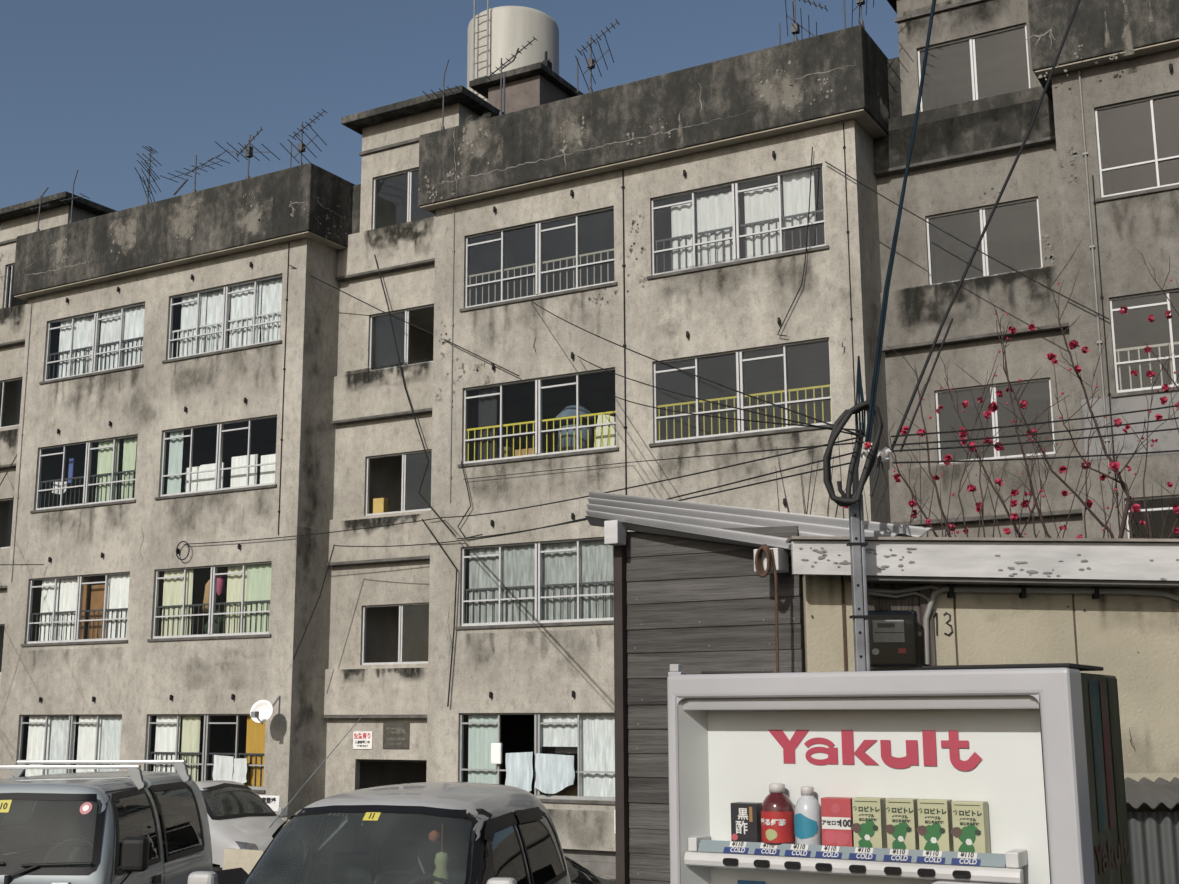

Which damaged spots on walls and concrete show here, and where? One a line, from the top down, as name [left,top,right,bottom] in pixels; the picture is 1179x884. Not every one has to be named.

peeling [417,117,502,206]
crack [419,110,753,192]
water stain [367,217,431,247]
water stain [900,266,1052,327]
water stain [347,359,428,385]
peeling [799,547,851,567]
peeling [865,548,917,570]
peeling [995,555,1060,576]
water stain [344,668,421,679]